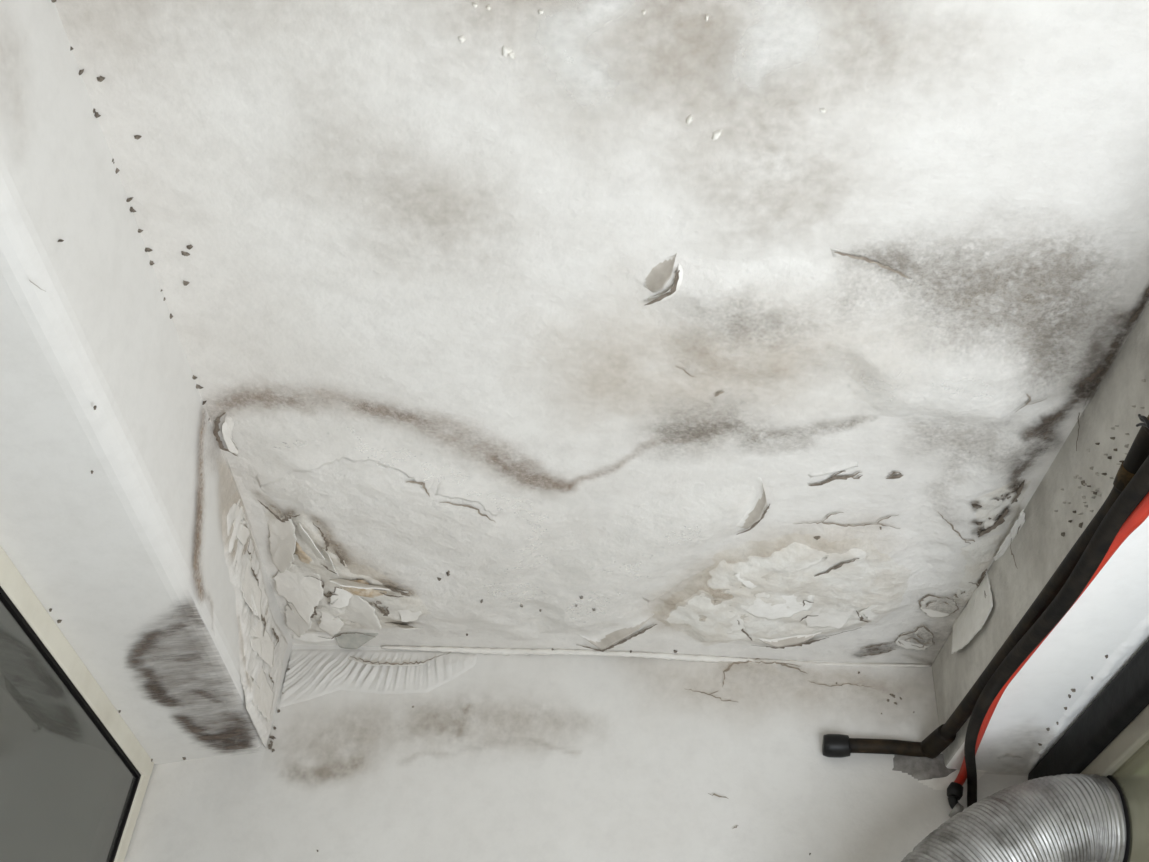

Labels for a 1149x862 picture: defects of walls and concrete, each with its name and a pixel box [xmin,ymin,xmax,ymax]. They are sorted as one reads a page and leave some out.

peeling [643,253,683,305]
water stain [937,266,1066,357]
water stain [1011,287,1149,483]
water stain [129,375,252,750]
flaking render [221,492,477,752]
flaking render [577,477,912,652]
flaking render [862,478,1031,656]